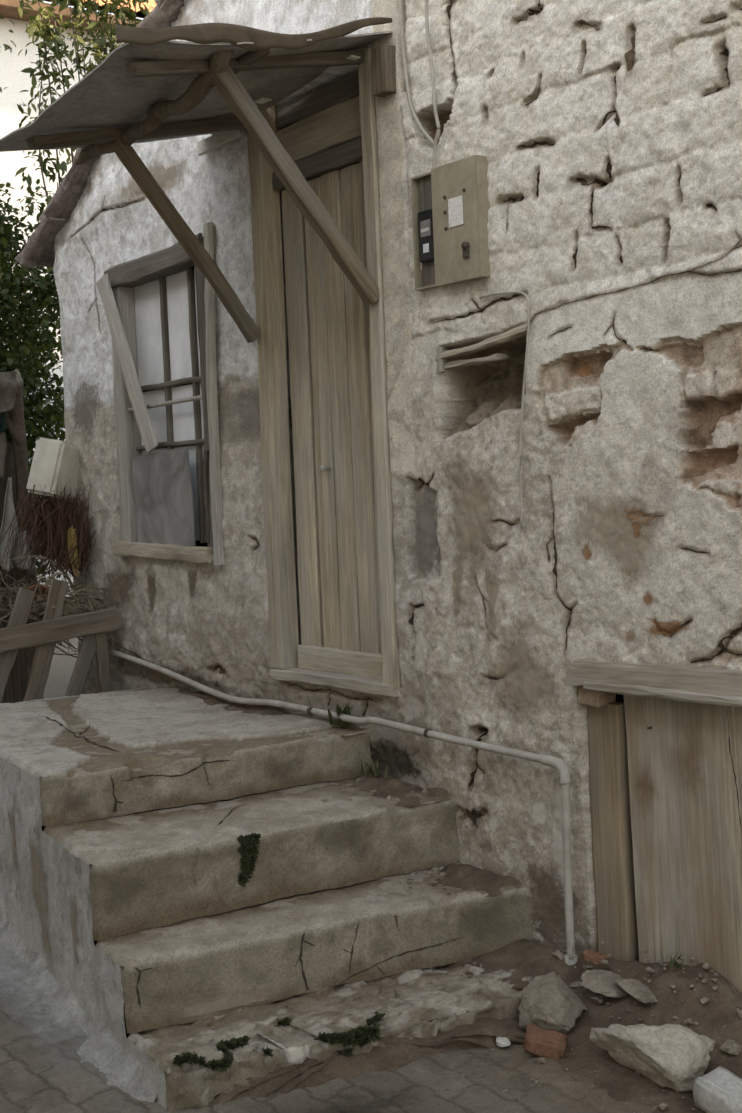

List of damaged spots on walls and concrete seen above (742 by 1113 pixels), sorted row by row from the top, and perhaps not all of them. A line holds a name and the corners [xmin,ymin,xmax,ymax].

flaking render [532,322,742,519]
peeling [416,496,440,568]
crack [546,493,574,654]
crack [678,546,709,554]
crack [659,620,692,637]
crack [690,622,742,663]
flaking render [712,614,742,670]
crack [44,716,236,812]
crack [294,923,463,999]